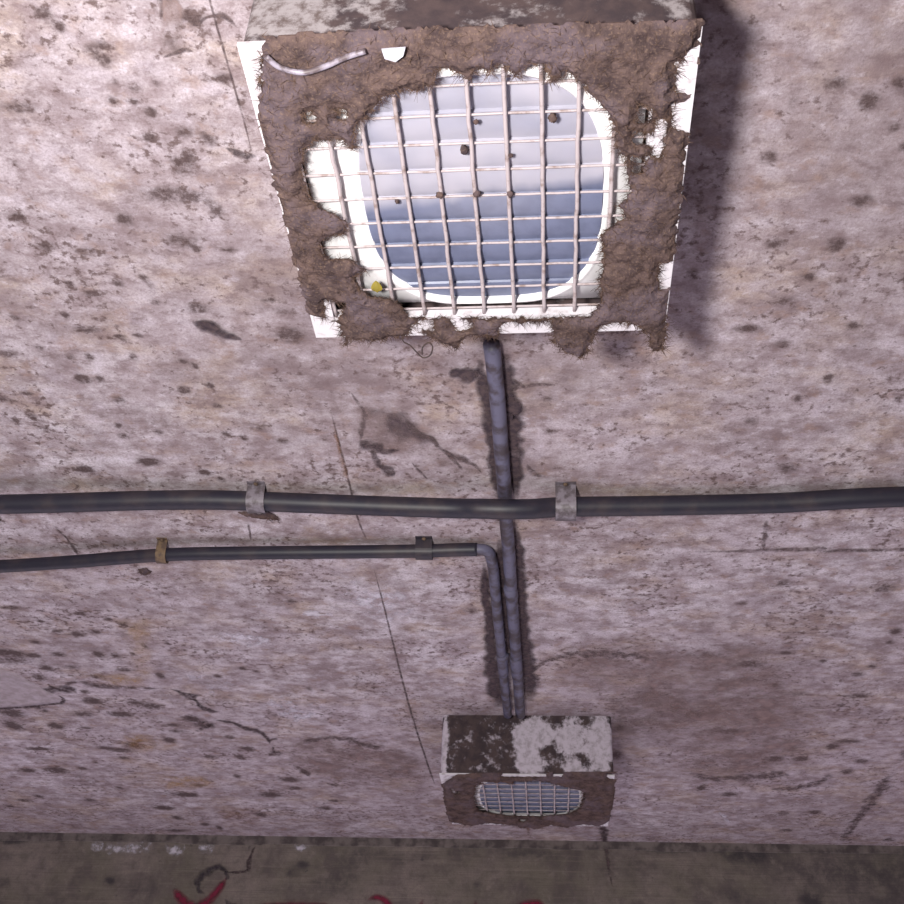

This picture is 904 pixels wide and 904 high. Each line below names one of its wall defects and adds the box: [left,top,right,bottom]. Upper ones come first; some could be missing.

crack [734,523,904,552]
crack [174,690,282,756]
crack [844,780,887,837]